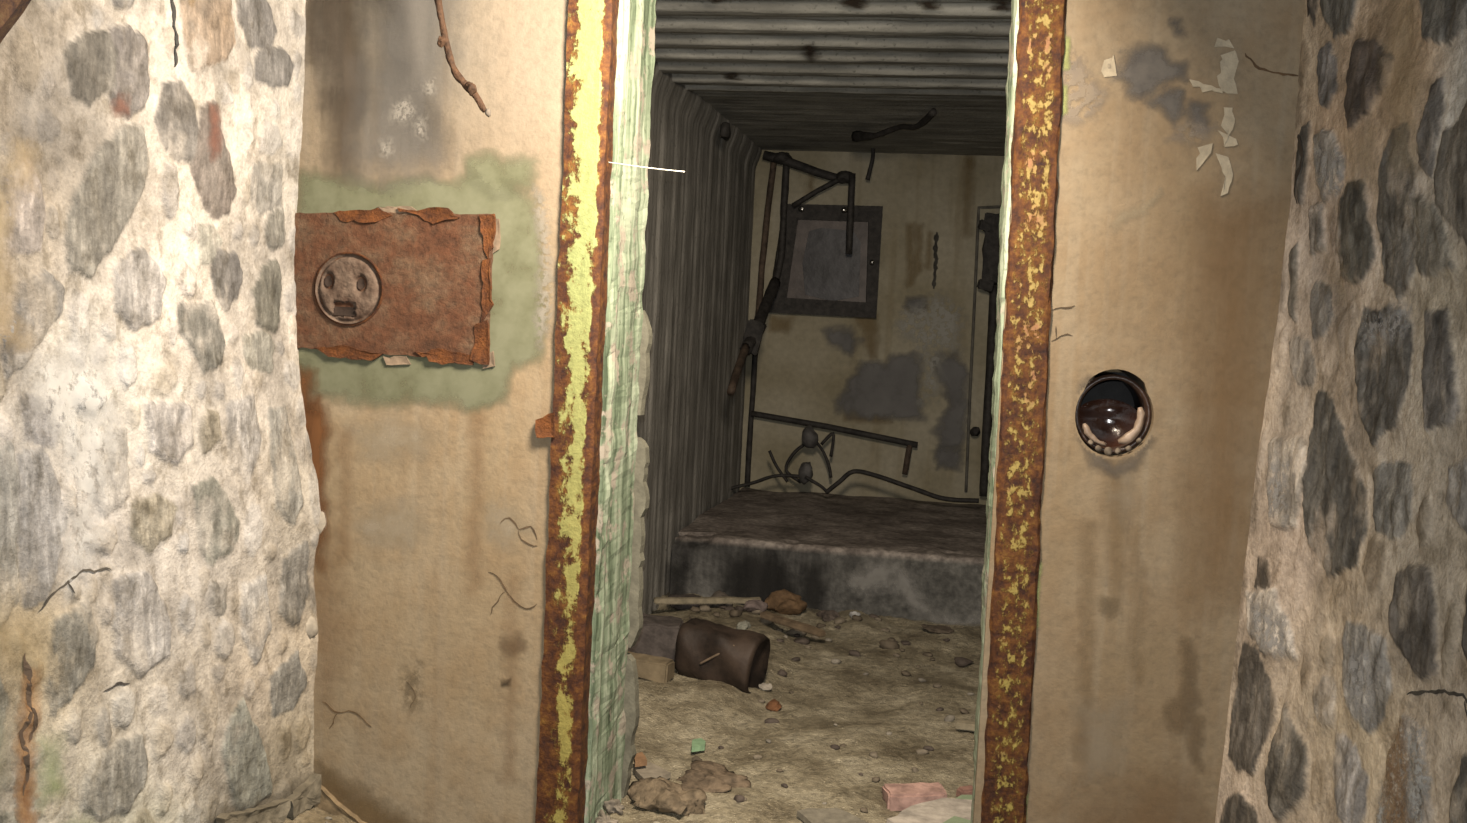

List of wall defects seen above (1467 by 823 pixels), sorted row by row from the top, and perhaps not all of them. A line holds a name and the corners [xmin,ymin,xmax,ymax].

crack [1245,53,1299,76]
spalling [1062,38,1239,196]
corrosion [334,207,460,224]
peeling [298,153,545,410]
corrosion [415,214,496,365]
corrosion [314,345,383,361]
crack [39,567,112,611]
crack [1407,689,1467,716]